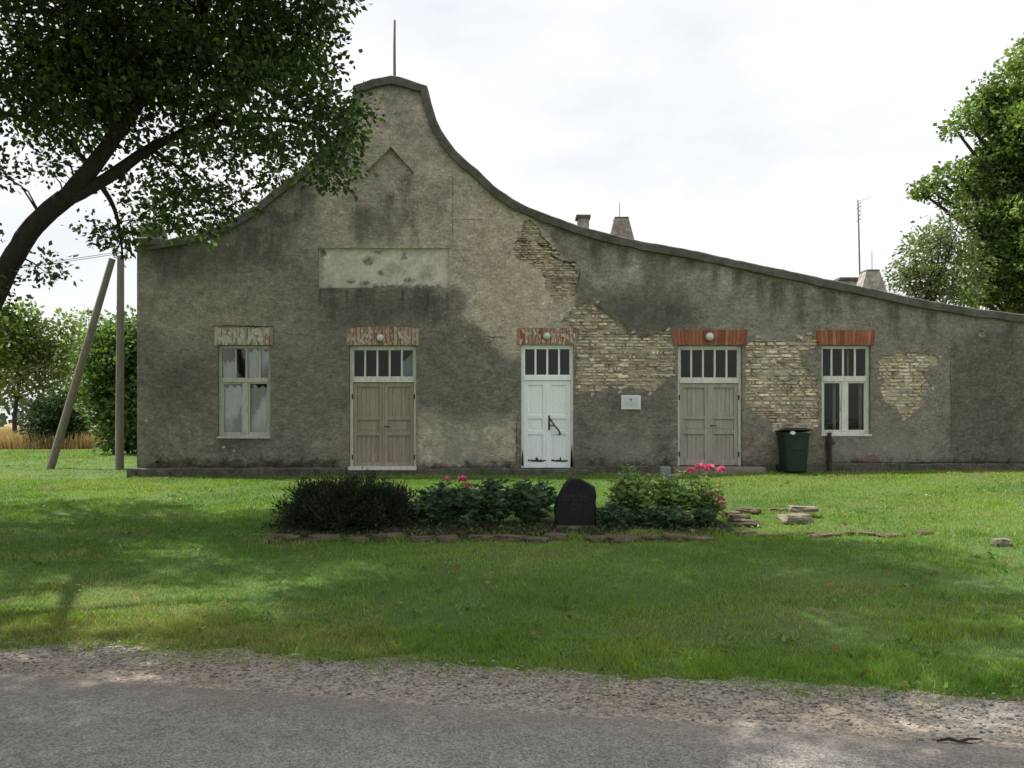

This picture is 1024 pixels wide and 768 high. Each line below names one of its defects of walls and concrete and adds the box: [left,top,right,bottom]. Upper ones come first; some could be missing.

peeling [215,328,270,345]
peeling [347,329,417,346]
spalling [513,220,676,396]
spalling [745,332,820,432]
spalling [877,352,942,421]